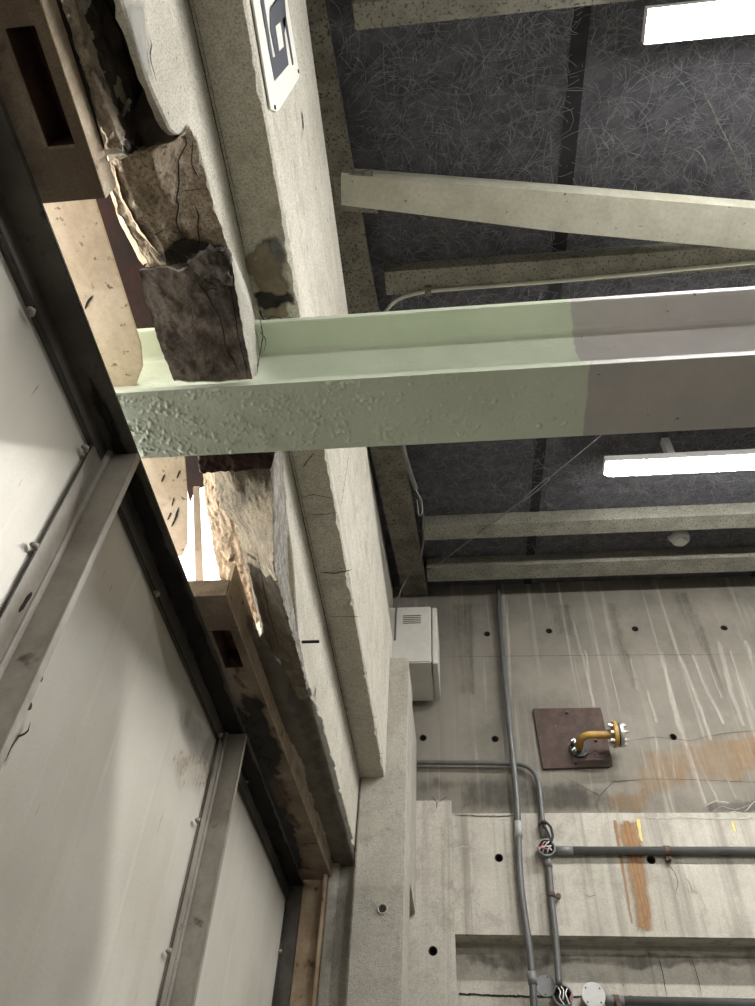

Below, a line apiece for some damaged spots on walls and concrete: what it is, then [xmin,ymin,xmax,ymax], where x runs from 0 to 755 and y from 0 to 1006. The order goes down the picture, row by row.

spalling [61,0,235,290]
crack [149,135,203,241]
crack [193,274,266,378]
peeling [245,239,294,320]
spalling [203,451,310,700]
damp [233,662,302,870]
crack [570,779,755,813]
crack [637,731,747,741]
rust [614,819,651,930]